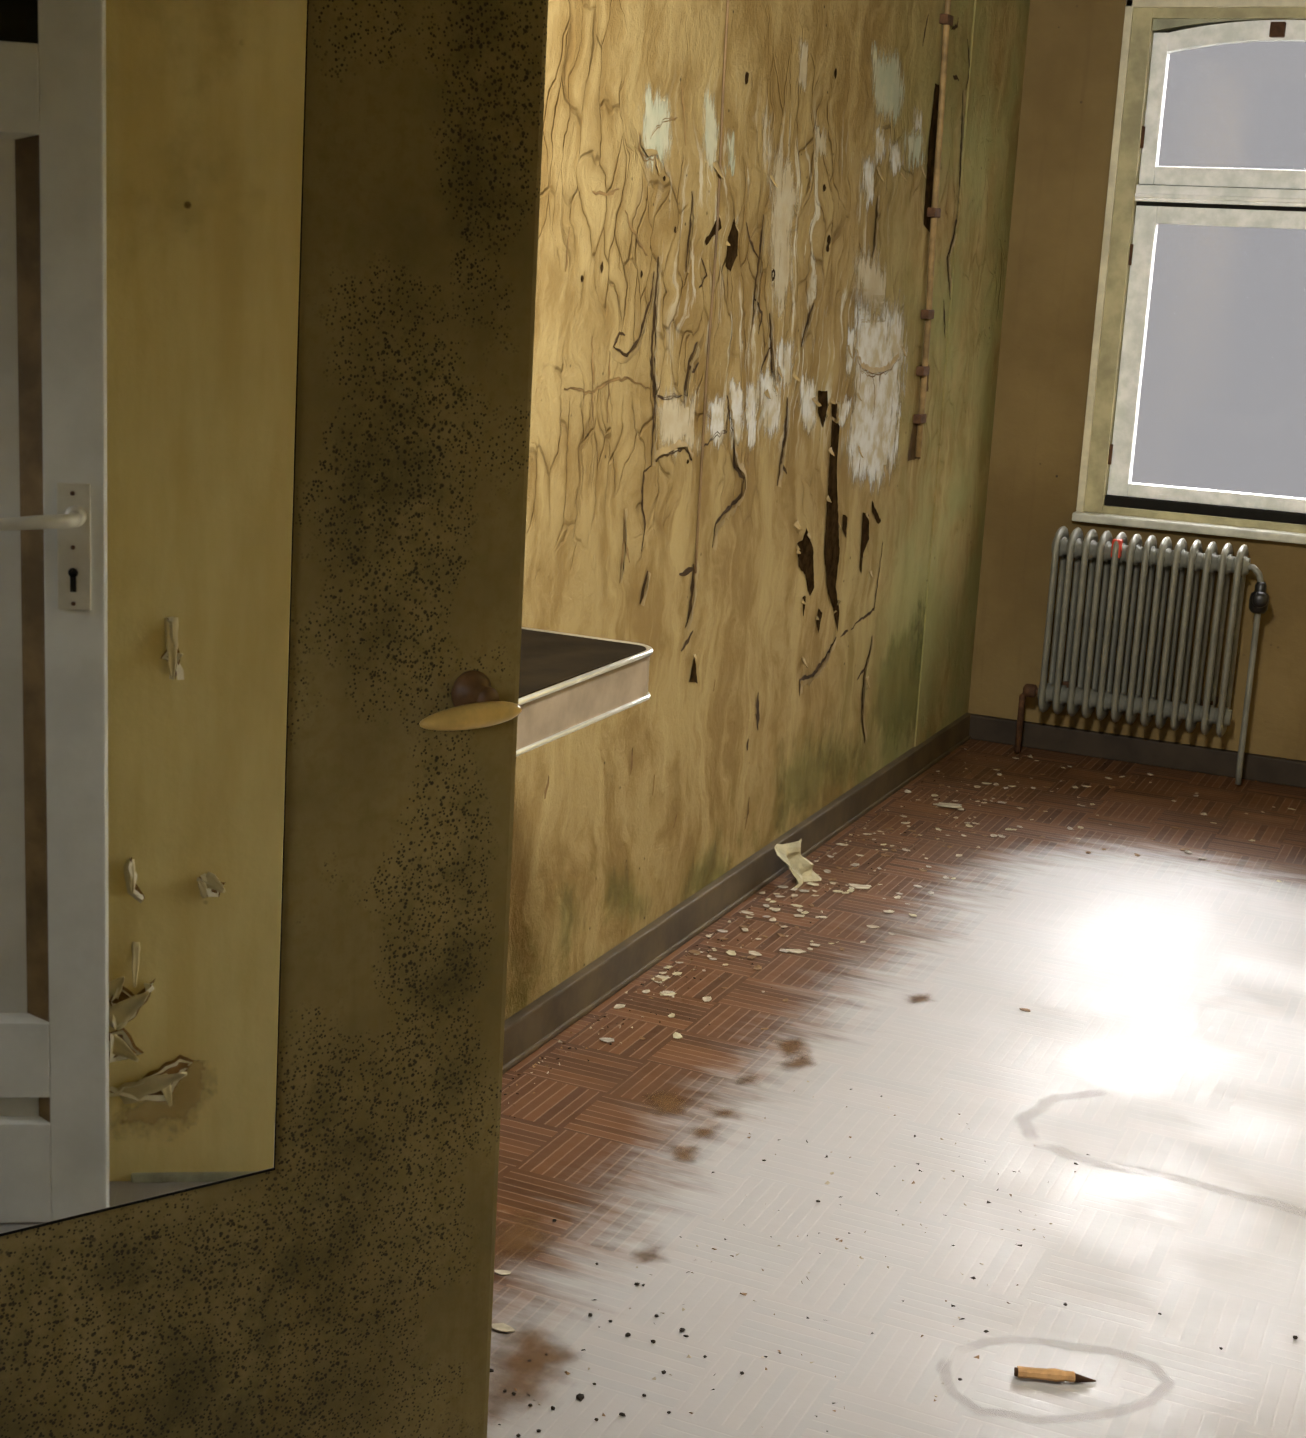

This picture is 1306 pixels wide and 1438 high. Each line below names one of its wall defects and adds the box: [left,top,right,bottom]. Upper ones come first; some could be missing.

peeling [643,85,671,175]
crack [638,82,686,169]
peeling [704,91,736,179]
spalling [705,214,740,271]
peeling [762,105,799,315]
peeling [862,41,940,232]
crack [923,14,970,335]
crack [563,188,816,652]
peeling [656,249,929,633]
crack [855,349,900,414]
crack [746,692,760,750]
crack [799,542,883,743]